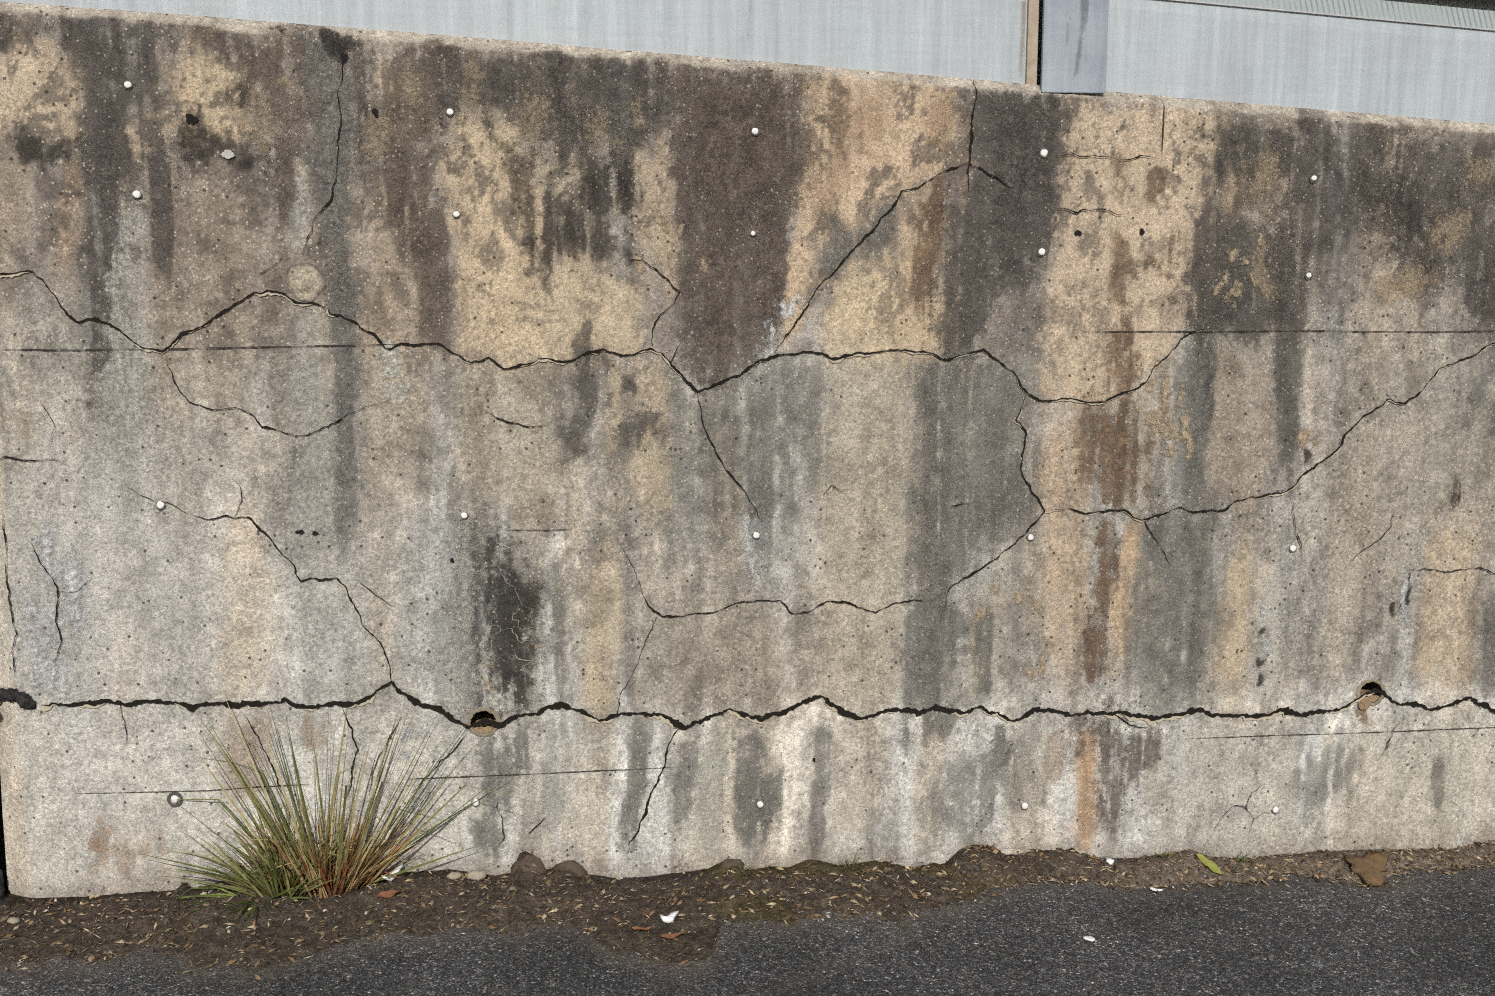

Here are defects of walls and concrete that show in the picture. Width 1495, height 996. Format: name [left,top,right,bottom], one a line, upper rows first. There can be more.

water stain [11,514,112,725]
water stain [0,13,174,534]
water stain [453,520,567,712]
water stain [469,720,584,862]
water stain [185,21,902,582]
crack [0,59,1495,851]
water stain [920,723,1030,843]
water stain [892,85,1084,757]
water stain [1059,510,1278,836]
water stain [1173,113,1495,492]